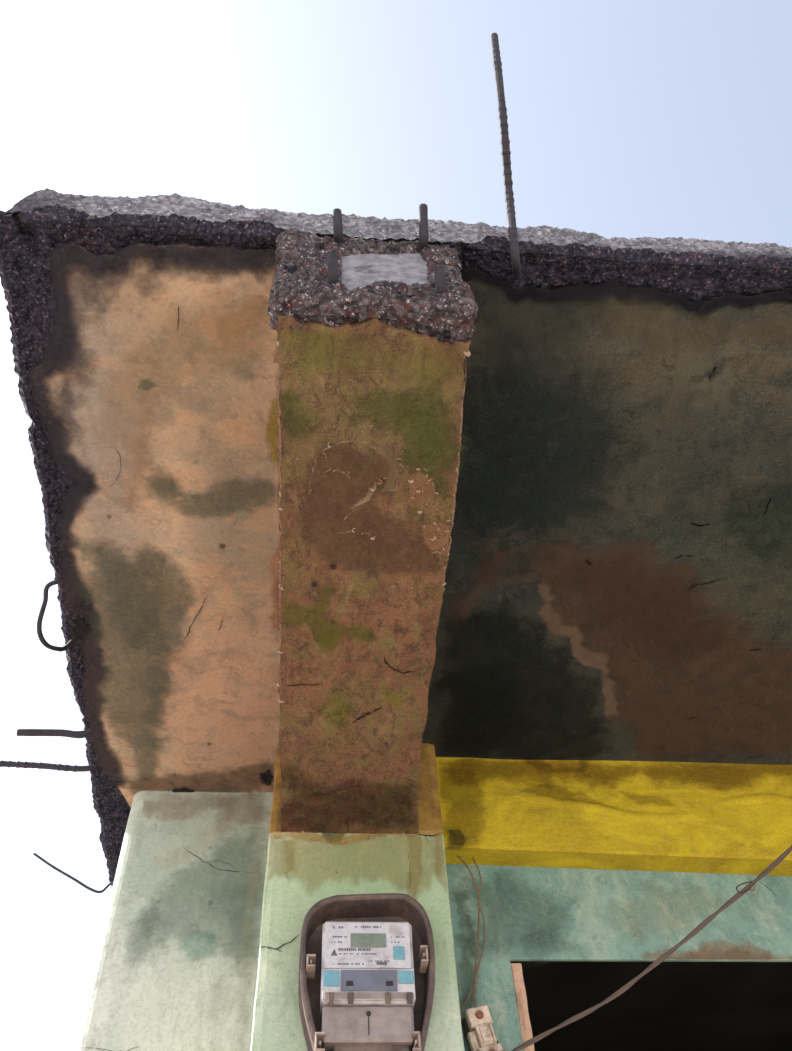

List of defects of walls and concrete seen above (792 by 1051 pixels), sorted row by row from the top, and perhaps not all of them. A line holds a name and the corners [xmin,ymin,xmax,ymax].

spalling [267,33,792,344]
spalling [0,203,286,893]
leakage [28,241,277,787]
peeling [408,468,439,514]
spalling [421,351,471,591]
leakage [437,540,792,760]